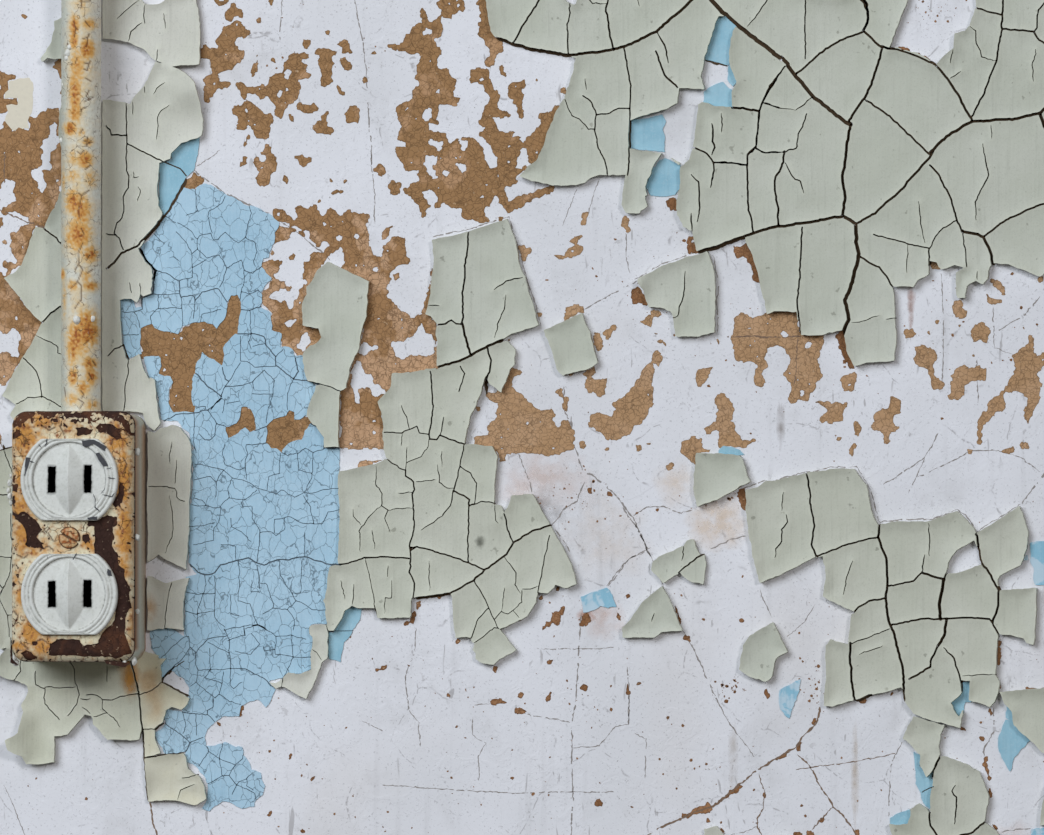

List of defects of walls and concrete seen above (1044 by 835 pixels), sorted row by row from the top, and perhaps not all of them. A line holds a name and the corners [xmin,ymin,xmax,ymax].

peeling [232,39,334,186]
peeling [315,39,352,95]
crack [354,2,376,221]
crack [0,210,61,243]
peeling [0,71,61,420]
crack [496,0,1044,399]
crack [0,439,47,475]
crack [14,61,745,835]
peeling [588,333,666,451]
peeling [913,345,992,400]
peeling [967,327,1044,454]
peeling [666,367,1044,835]